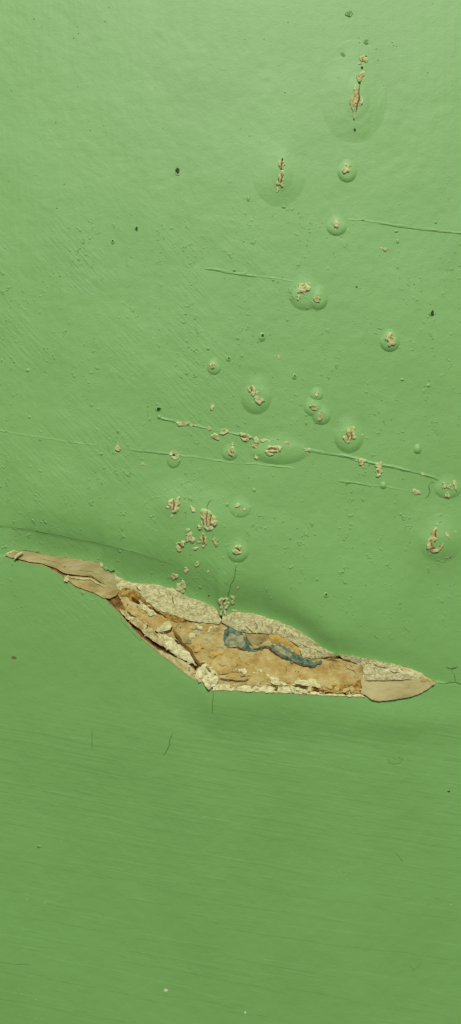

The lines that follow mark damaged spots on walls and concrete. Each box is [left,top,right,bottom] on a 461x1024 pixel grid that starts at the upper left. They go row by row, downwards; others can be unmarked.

crack [347,218,461,234]
crack [204,267,293,282]
crack [0,417,440,498]
peeling [3,496,435,701]